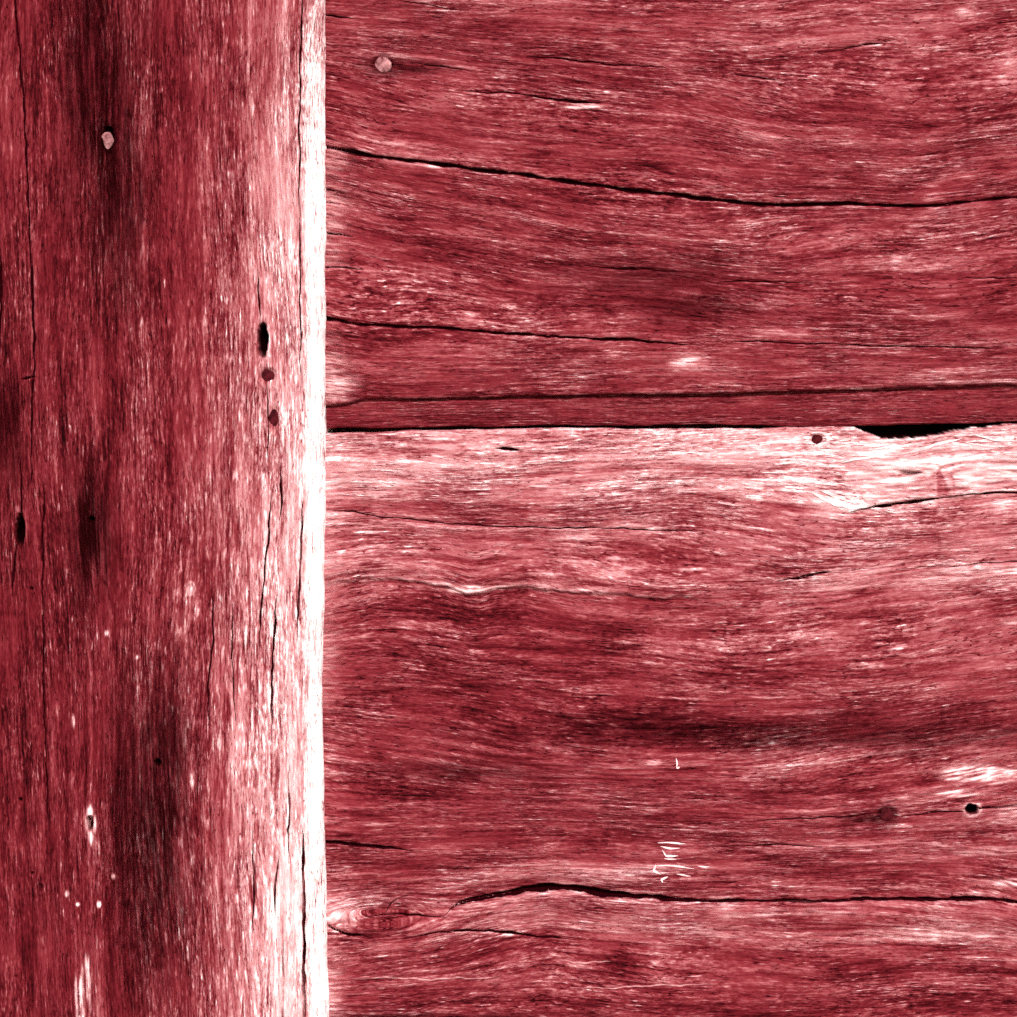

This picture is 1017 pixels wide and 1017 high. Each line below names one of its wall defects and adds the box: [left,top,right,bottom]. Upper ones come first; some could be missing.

crack [410,62,603,104]
crack [527,56,666,68]
crack [814,39,896,55]
crack [298,0,351,389]
crack [326,146,1017,208]
crack [0,257,8,344]
crack [585,264,675,272]
crack [708,277,810,285]
crack [326,316,698,345]
crack [730,340,1004,349]
crack [14,0,49,832]
crack [252,765,1017,1017]